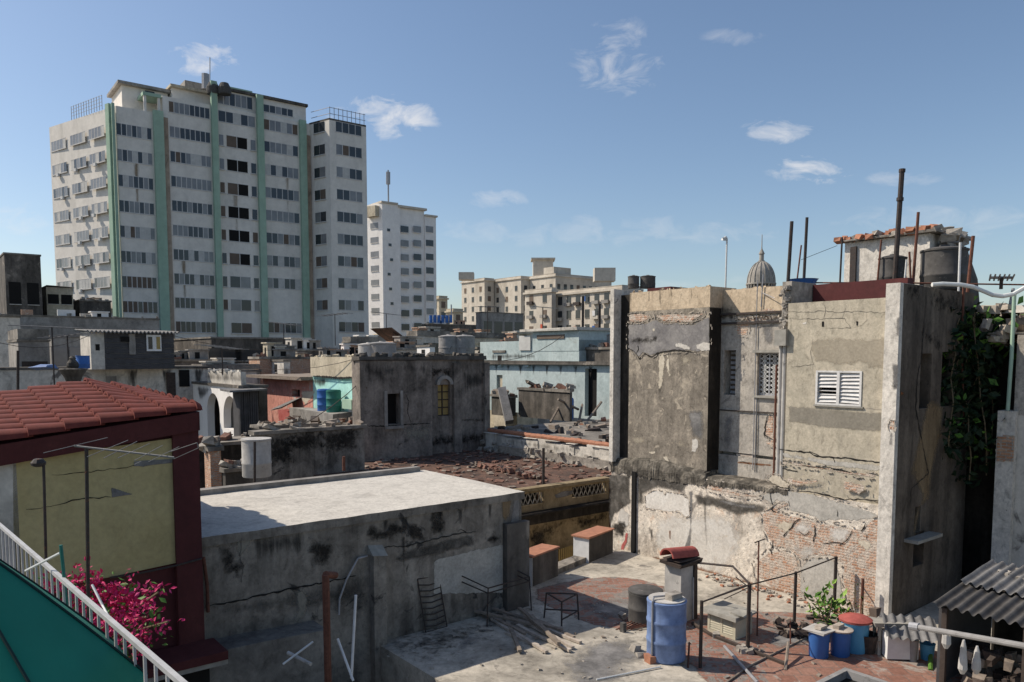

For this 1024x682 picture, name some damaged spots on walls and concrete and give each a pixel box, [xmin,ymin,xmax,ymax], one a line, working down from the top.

flaking render [628,311,706,331]
flaking render [675,342,710,363]
flaking render [995,435,1015,462]
crack [26,465,134,510]
crack [764,416,880,554]
leakage [368,512,472,560]
peeling [645,489,740,572]
flaking render [700,459,878,615]
crack [210,545,356,606]